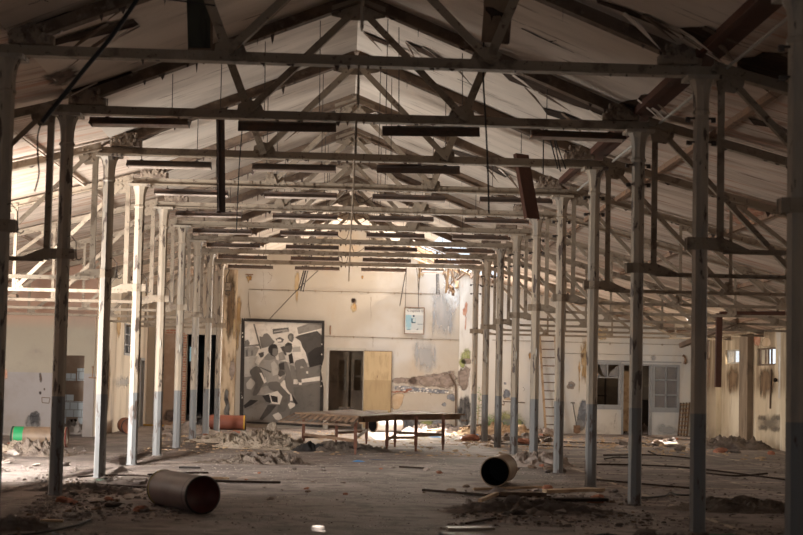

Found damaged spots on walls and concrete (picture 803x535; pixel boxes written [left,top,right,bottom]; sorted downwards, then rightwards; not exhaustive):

spalling [391,358,471,410]